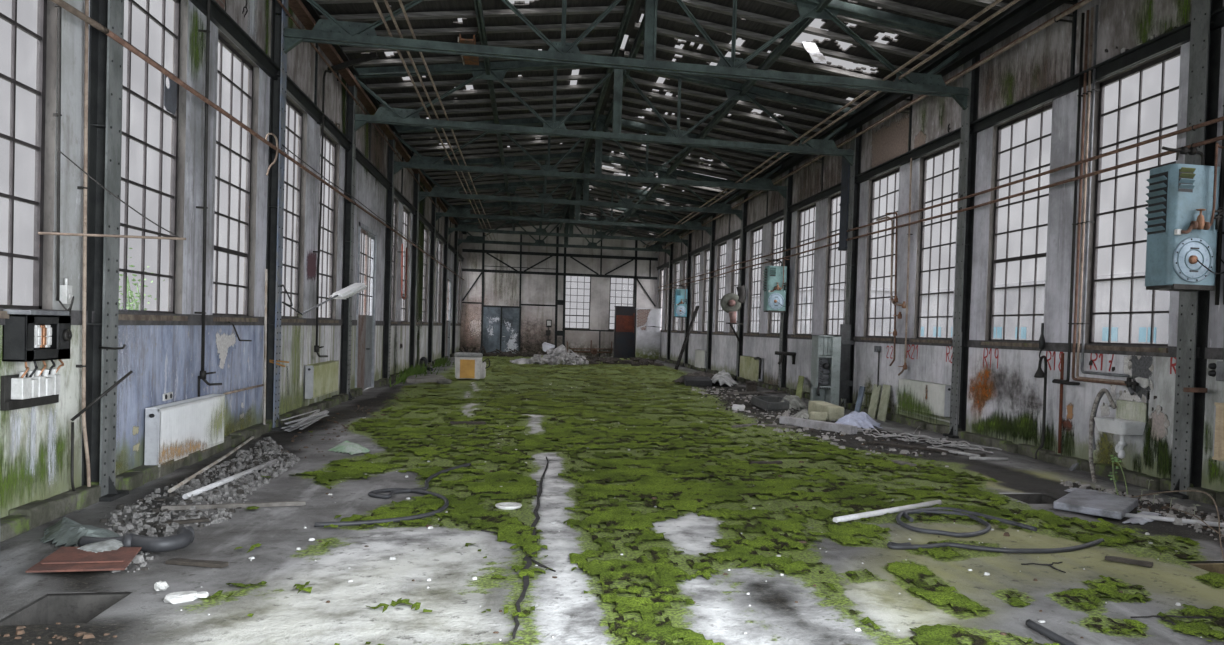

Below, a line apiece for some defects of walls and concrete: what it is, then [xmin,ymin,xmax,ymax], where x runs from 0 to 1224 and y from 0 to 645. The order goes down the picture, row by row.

peeling [216,332,238,369]
leakage [0,408,71,509]
rust [158,440,206,463]